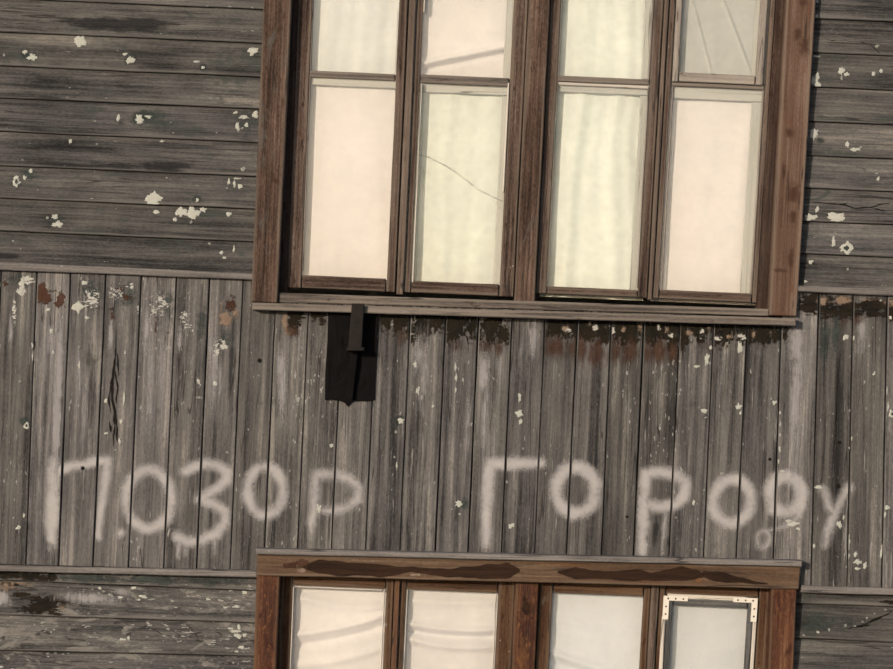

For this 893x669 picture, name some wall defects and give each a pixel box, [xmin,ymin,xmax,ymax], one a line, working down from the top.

peeling [145,190,163,214]
peeling [173,196,207,224]
peeling [3,275,35,340]
peeling [71,281,171,350]
peeling [168,311,205,348]
crack [108,349,119,446]
peeling [225,624,247,652]
crack [849,612,891,629]